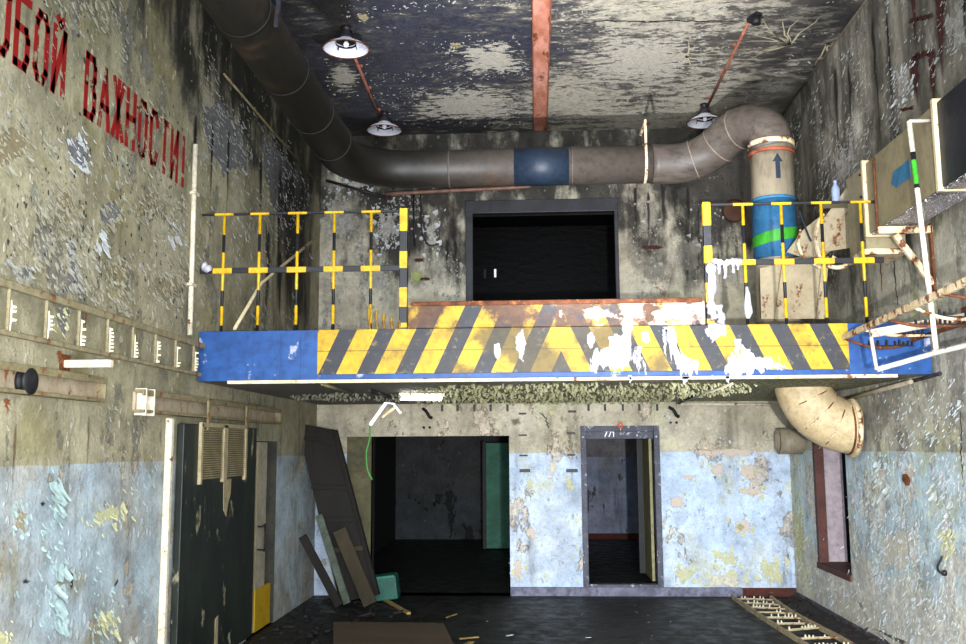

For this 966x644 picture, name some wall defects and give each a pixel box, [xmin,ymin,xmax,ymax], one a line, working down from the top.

leakage [311,0,356,32]
leakage [645,14,818,72]
peeling [666,369,966,644]
peeling [0,620,13,644]